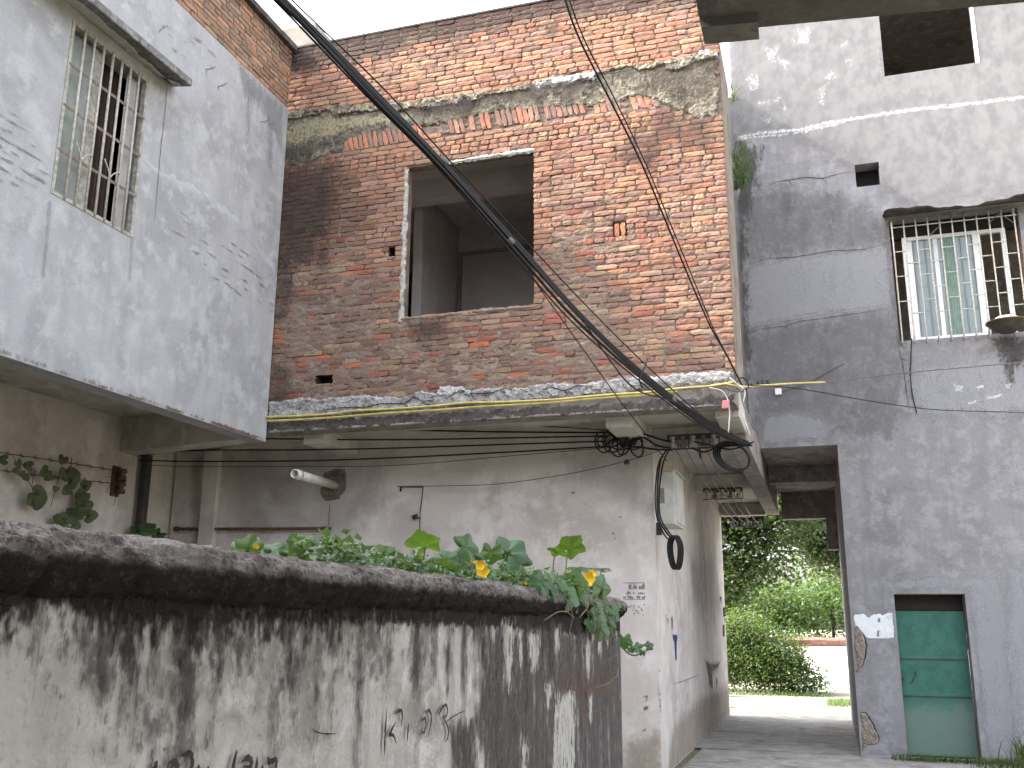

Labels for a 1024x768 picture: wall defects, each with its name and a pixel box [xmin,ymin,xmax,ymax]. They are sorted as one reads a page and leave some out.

spalling [536,71,598,90]
crack [768,171,853,186]
leakage [995,337,1024,382]
spalling [437,385,471,397]
flaking render [320,469,346,501]
peeling [854,613,894,673]
leakage [0,593,623,768]